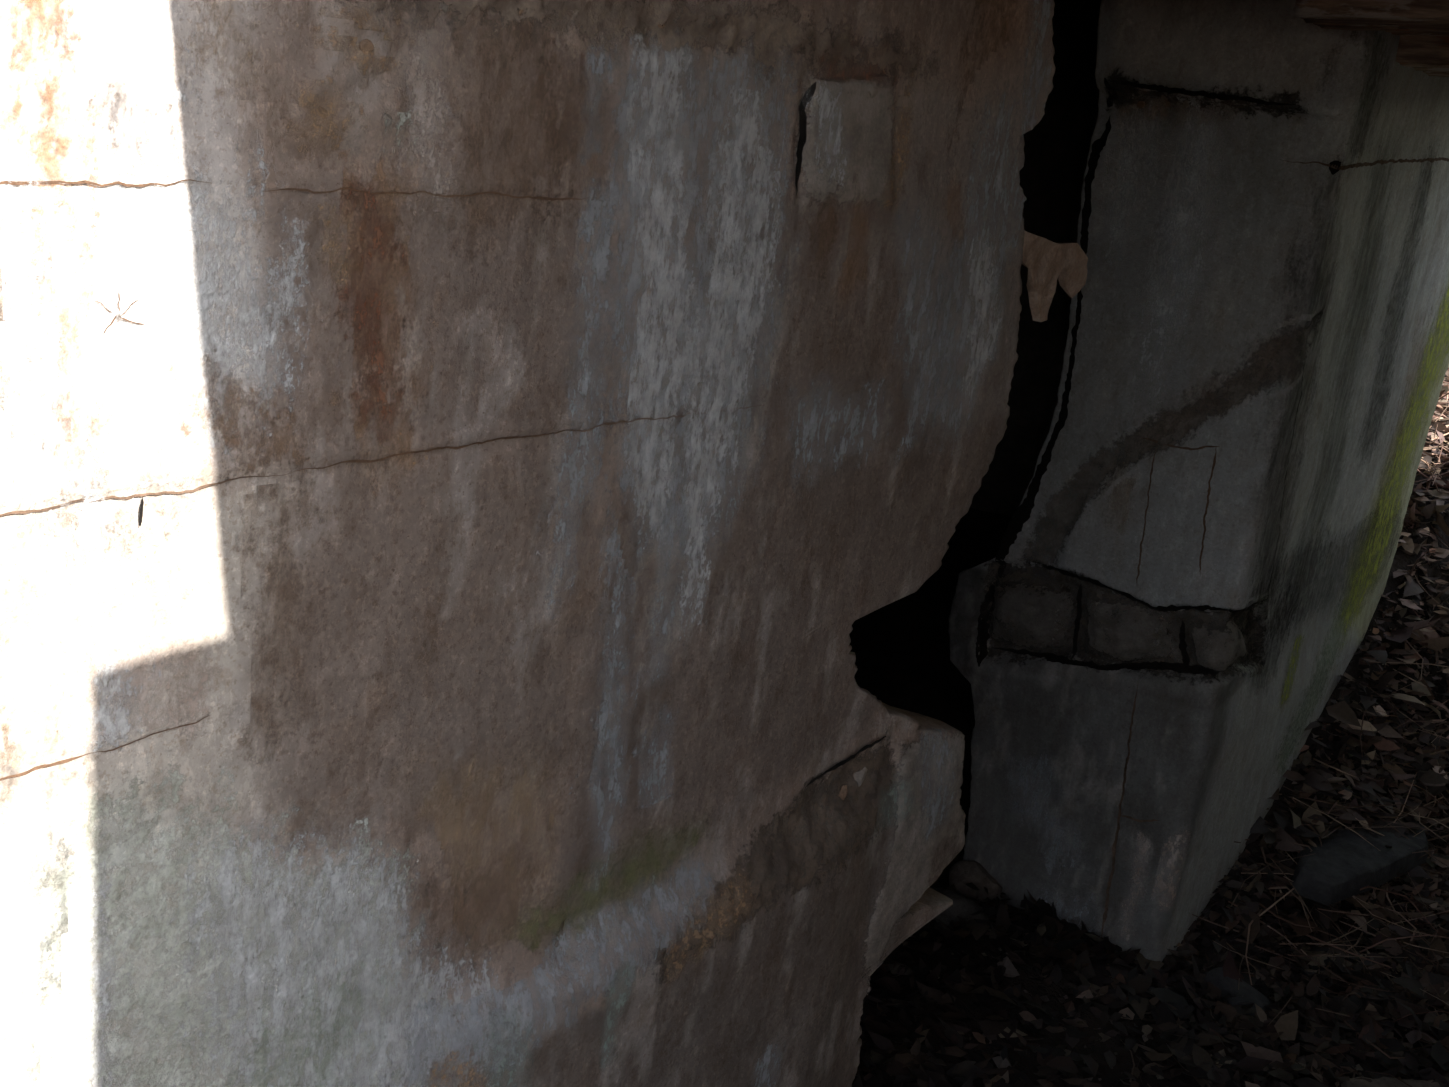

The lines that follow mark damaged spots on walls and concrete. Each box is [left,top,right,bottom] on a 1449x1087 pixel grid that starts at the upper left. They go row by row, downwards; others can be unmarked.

crack [0,179,209,187]
crack [266,187,587,201]
damp [788,0,1052,479]
crack [1080,78,1118,254]
crack [1279,157,1449,175]
damp [0,132,312,748]
crack [0,405,761,527]
damp [399,19,847,891]
crack [976,290,1083,667]
damp [0,766,712,1087]
spalling [649,728,965,995]